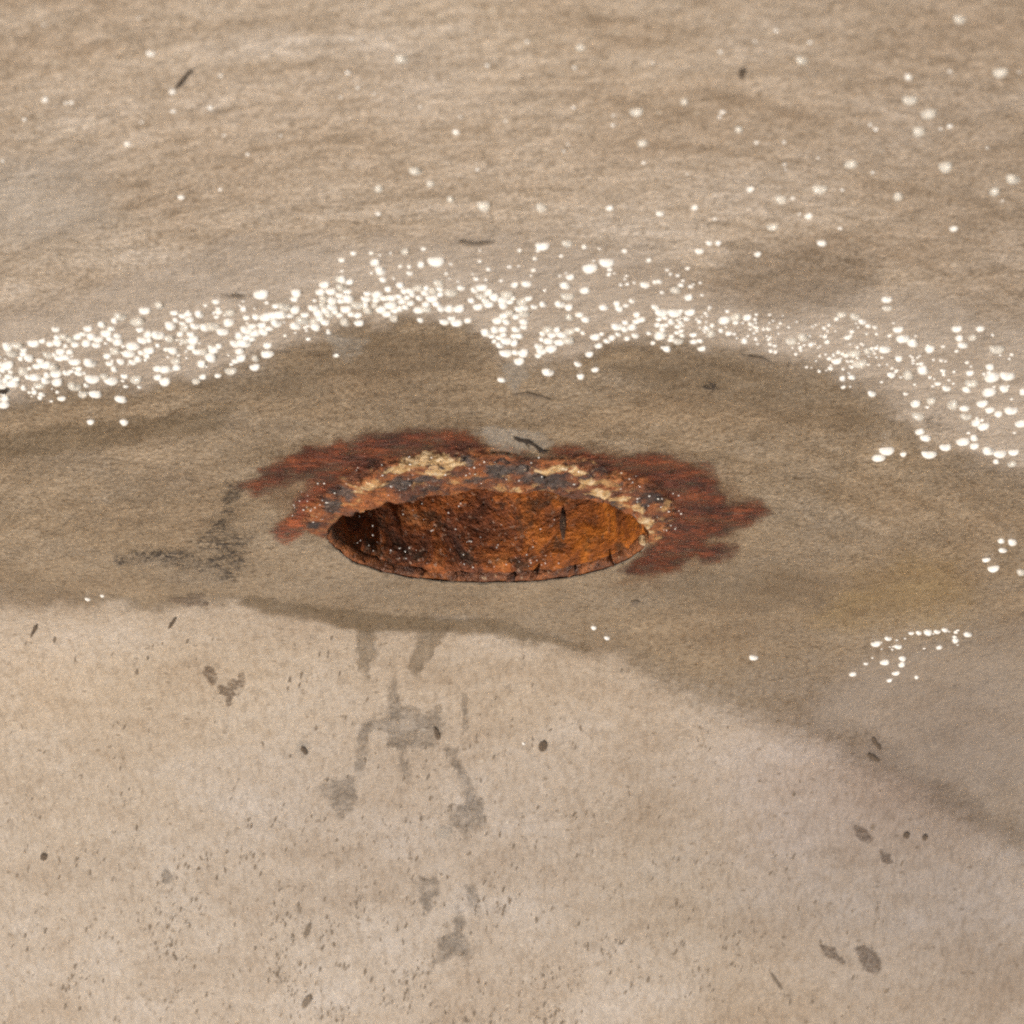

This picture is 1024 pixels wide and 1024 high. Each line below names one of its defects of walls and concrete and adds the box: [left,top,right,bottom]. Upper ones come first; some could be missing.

rust [239,431,486,539]
damp [0,237,1024,843]
peeling [504,571,537,582]
rust [553,447,768,574]